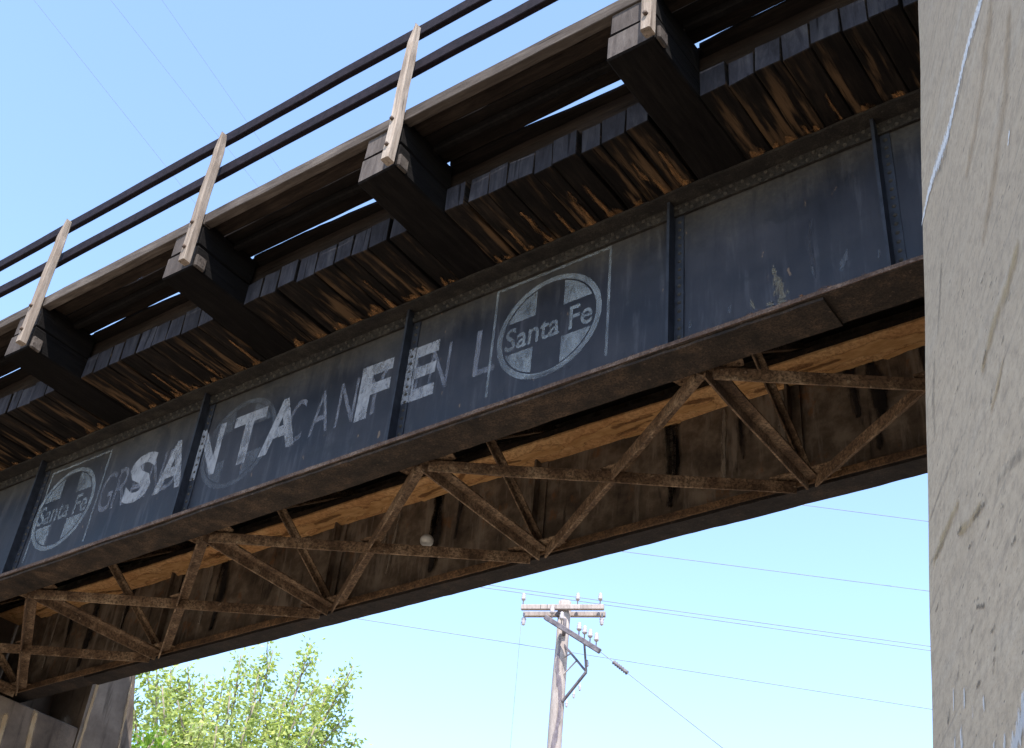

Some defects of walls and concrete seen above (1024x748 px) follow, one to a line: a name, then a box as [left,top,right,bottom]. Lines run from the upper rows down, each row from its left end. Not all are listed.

corrosion [786,332,925,373]
corrosion [150,365,222,408]
corrosion [507,397,717,466]
corrosion [410,483,448,501]
corrosion [458,463,501,486]
water stain [664,423,680,507]
corrosion [266,496,394,537]
corrosion [67,552,228,608]